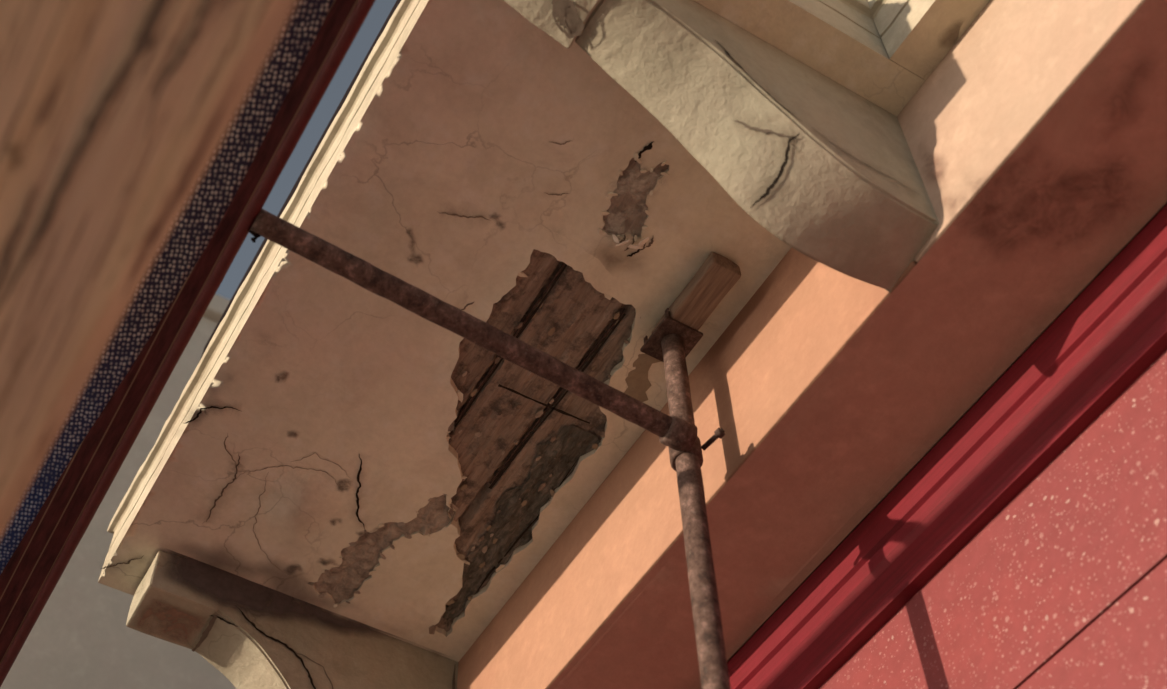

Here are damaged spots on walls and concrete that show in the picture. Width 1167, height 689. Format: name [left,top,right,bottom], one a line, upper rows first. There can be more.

spalling [551,0,585,39]
crack [718,43,915,208]
crack [438,212,491,221]
spalling [598,142,669,257]
spalling [486,249,662,402]
crack [186,406,240,423]
crack [202,437,365,574]
spalling [307,338,607,634]
crack [192,606,333,689]
leakage [168,552,390,634]